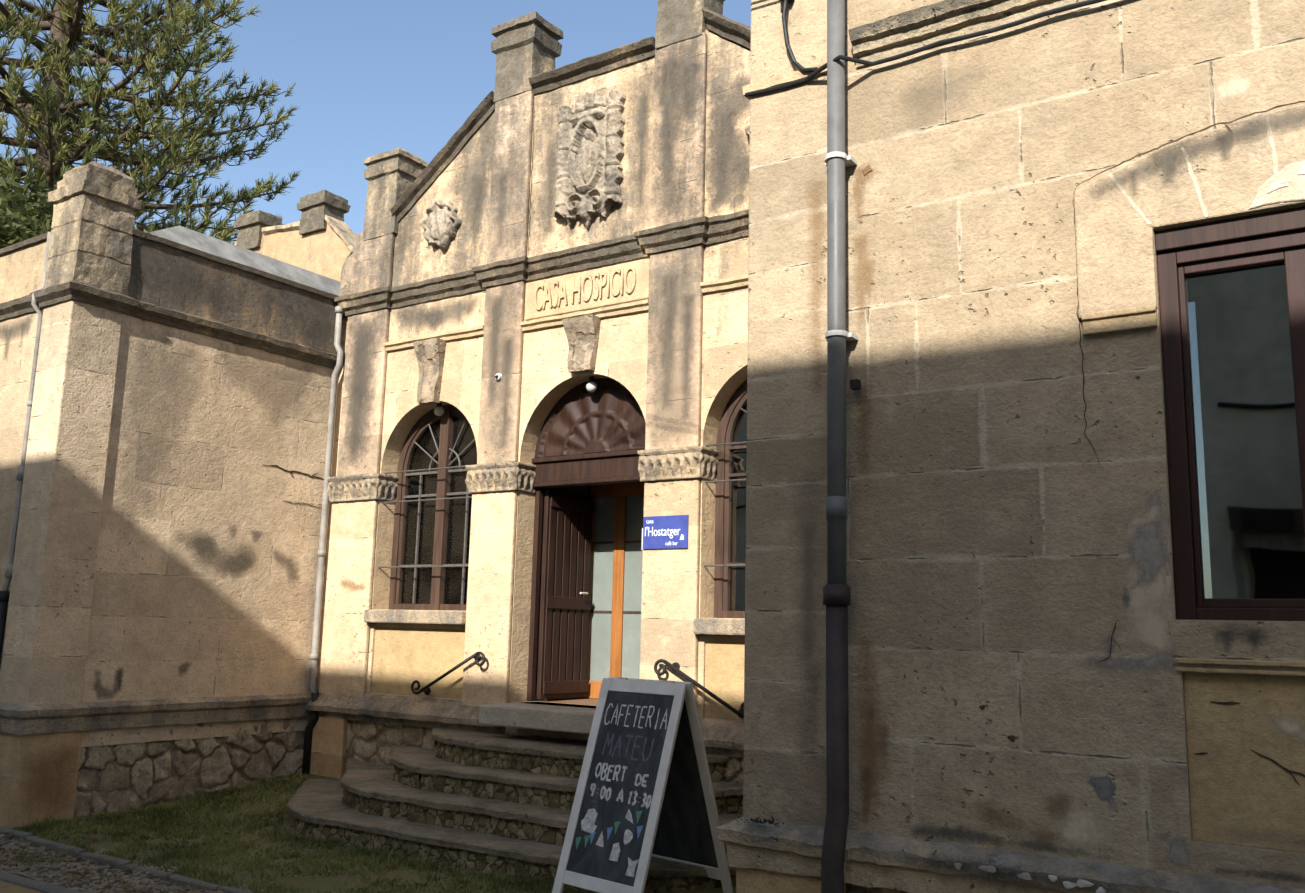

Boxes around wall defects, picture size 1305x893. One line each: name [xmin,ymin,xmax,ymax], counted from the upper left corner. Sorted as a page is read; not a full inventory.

damp [640,47,698,214]
crack [1073,101,1305,467]
damp [347,320,376,462]
crack [263,464,324,508]
damp [191,537,254,573]
damp [95,671,121,697]
crack [1250,749,1305,787]